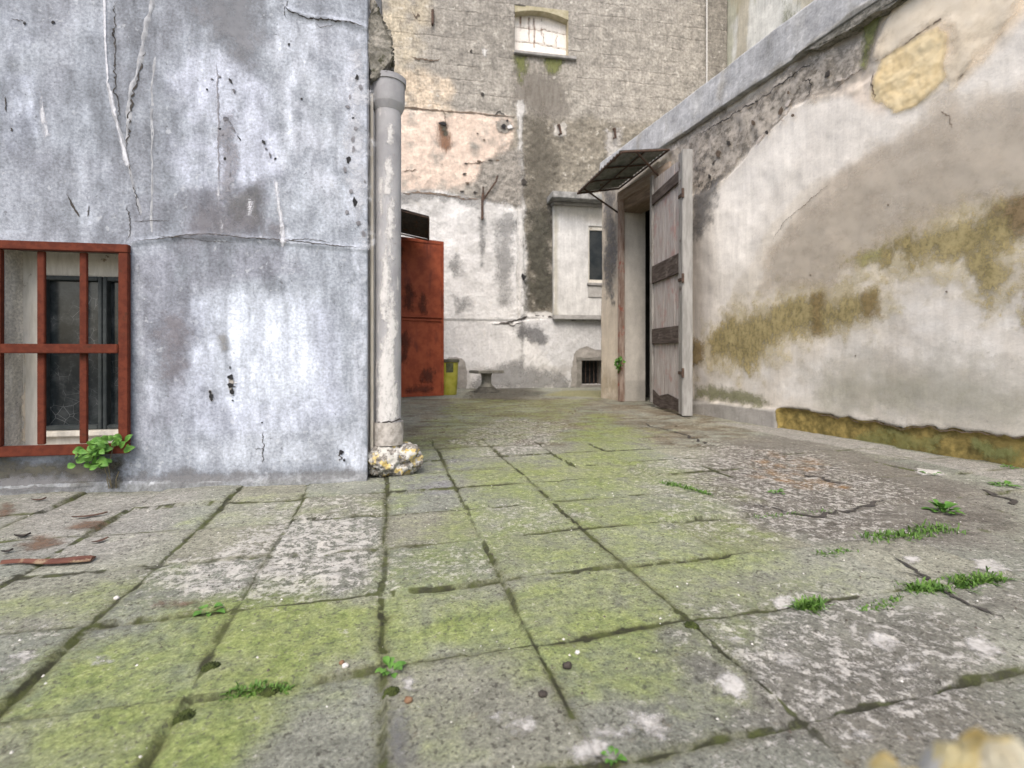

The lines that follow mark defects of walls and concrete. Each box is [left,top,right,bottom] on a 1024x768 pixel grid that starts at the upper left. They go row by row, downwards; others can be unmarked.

crack [284,1,366,27]
peeling [672,0,1018,193]
crack [126,208,364,248]
peeling [343,53,368,247]
water stain [479,71,567,344]
water stain [771,92,1024,280]
water stain [861,291,880,318]
water stain [969,243,1023,316]
rust [401,332,410,362]
water stain [693,338,704,366]